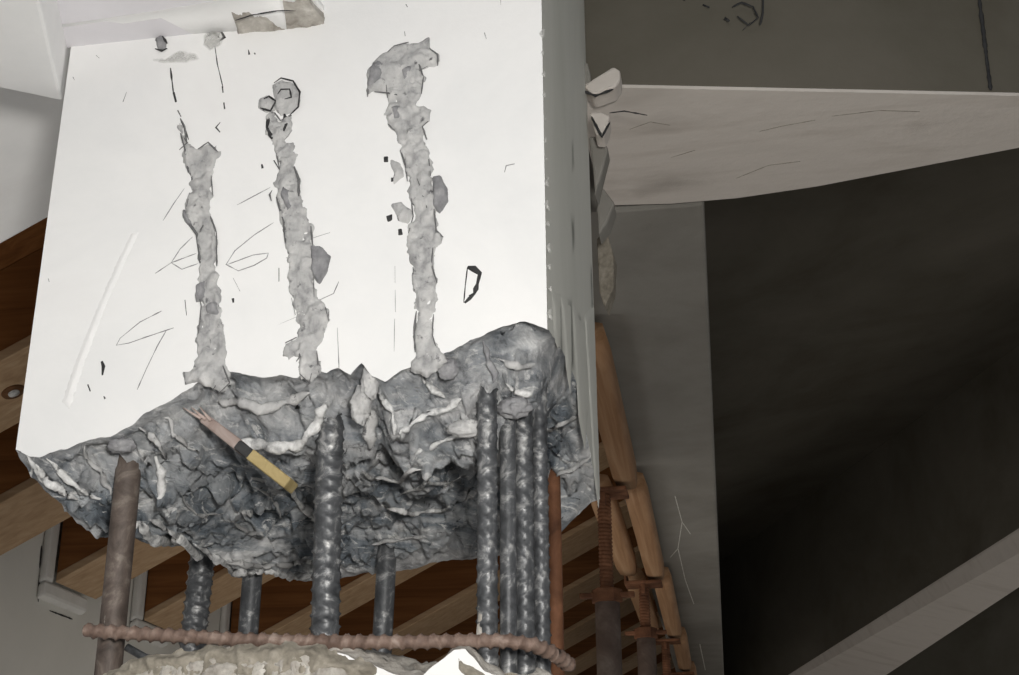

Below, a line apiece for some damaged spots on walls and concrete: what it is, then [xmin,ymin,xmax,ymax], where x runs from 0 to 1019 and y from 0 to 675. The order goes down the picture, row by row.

spalling [231,0,325,34]
spalling [16,61,647,675]